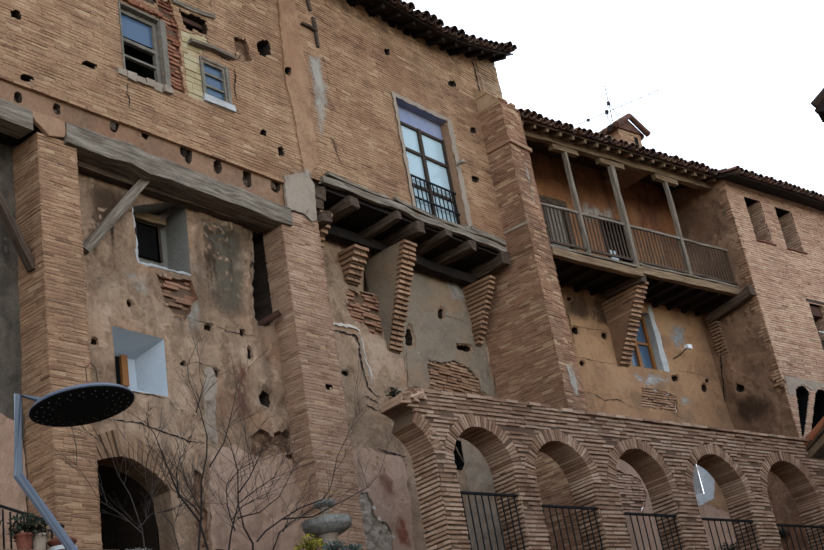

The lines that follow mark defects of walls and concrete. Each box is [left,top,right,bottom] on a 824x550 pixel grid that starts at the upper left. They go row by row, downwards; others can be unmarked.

flaking render [145,0,208,94]
spalling [155,272,198,321]
spalling [456,343,474,353]
spalling [379,360,487,413]
spalling [640,386,678,412]
leakage [737,397,769,422]
spalling [250,429,292,459]
spalling [359,492,395,550]